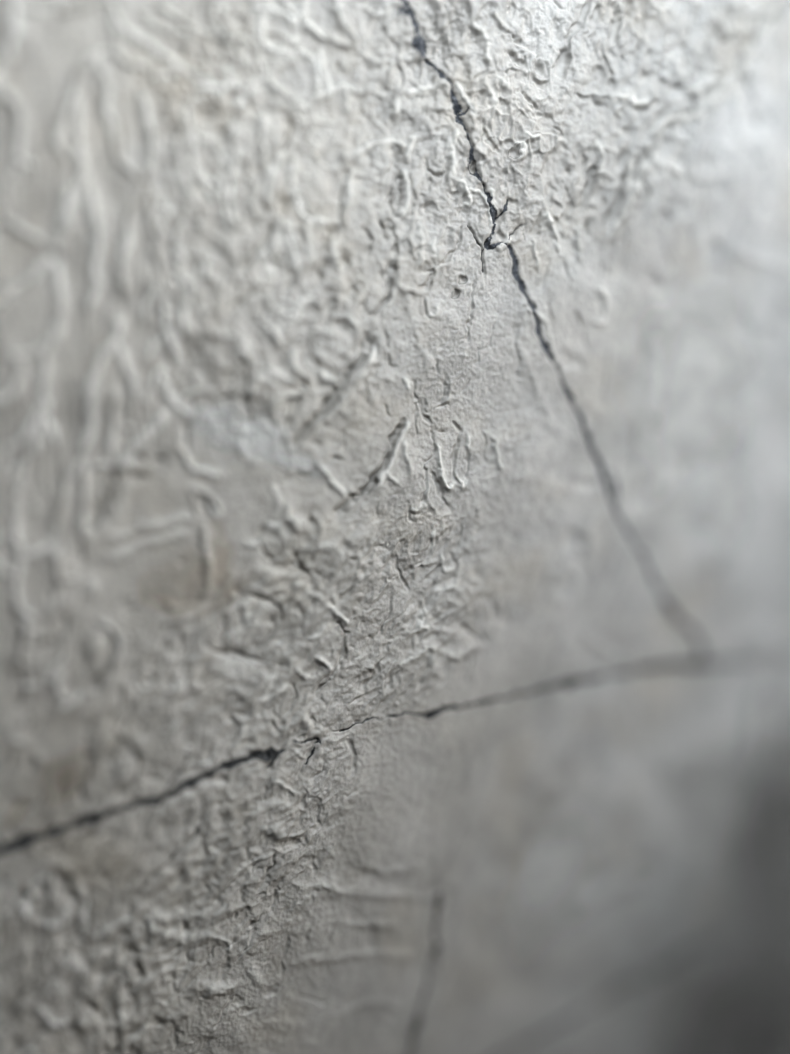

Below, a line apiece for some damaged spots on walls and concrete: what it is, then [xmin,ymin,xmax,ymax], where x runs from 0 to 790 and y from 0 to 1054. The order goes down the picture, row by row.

spalling [449,275,469,302]
spalling [292,277,402,446]
crack [0,0,753,855]
spalling [189,487,221,519]
spalling [332,417,413,519]
spalling [80,621,125,694]
peeling [223,591,283,649]
peeling [305,617,349,686]